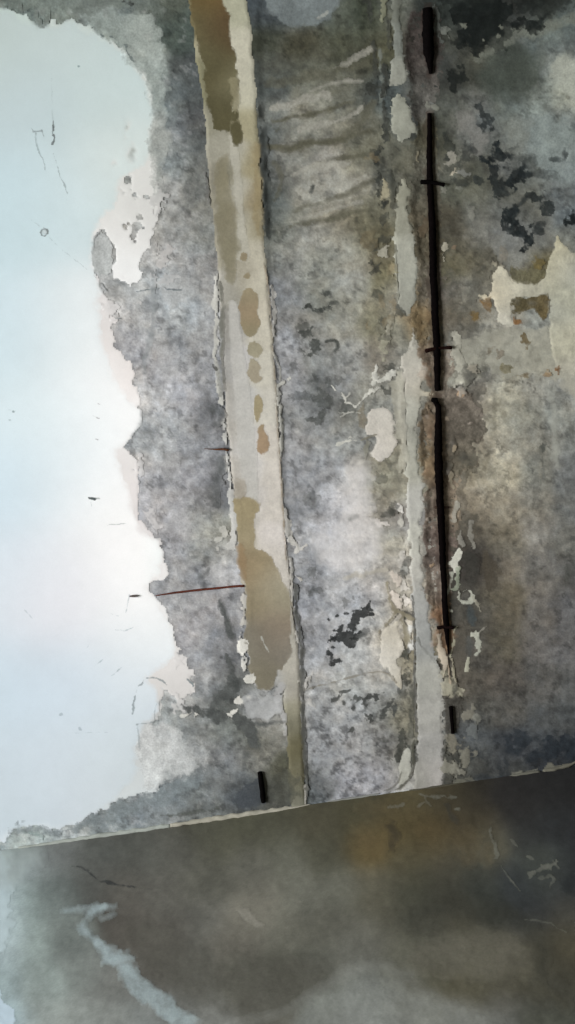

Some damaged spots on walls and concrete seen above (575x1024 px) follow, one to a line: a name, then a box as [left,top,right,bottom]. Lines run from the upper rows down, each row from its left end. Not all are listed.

damp [189,0,406,457]
damp [432,0,575,405]
spalling [365,6,575,634]
rust [413,110,457,660]
peeling [0,7,241,956]
damp [396,553,411,579]
flaking render [379,590,405,690]
damp [331,647,419,770]
flaking render [398,747,411,788]
damp [469,728,575,853]
peeling [0,988,17,1024]
damp [59,897,575,1024]